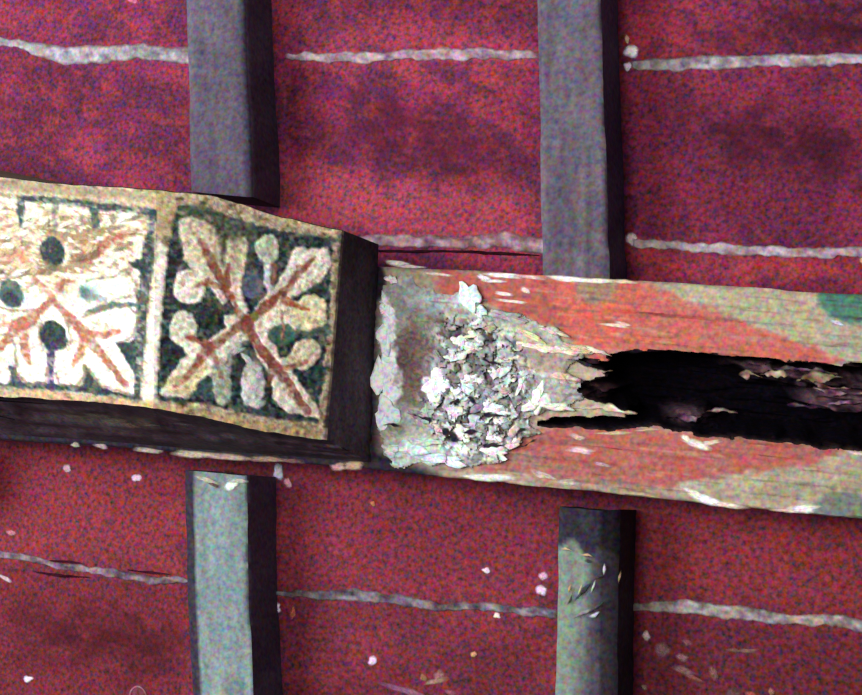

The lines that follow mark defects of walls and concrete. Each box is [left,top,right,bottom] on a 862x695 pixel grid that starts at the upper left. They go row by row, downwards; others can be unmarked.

peeling [370,261,592,481]
crack [0,400,46,420]
peeling [682,436,720,450]
peeling [533,471,577,485]